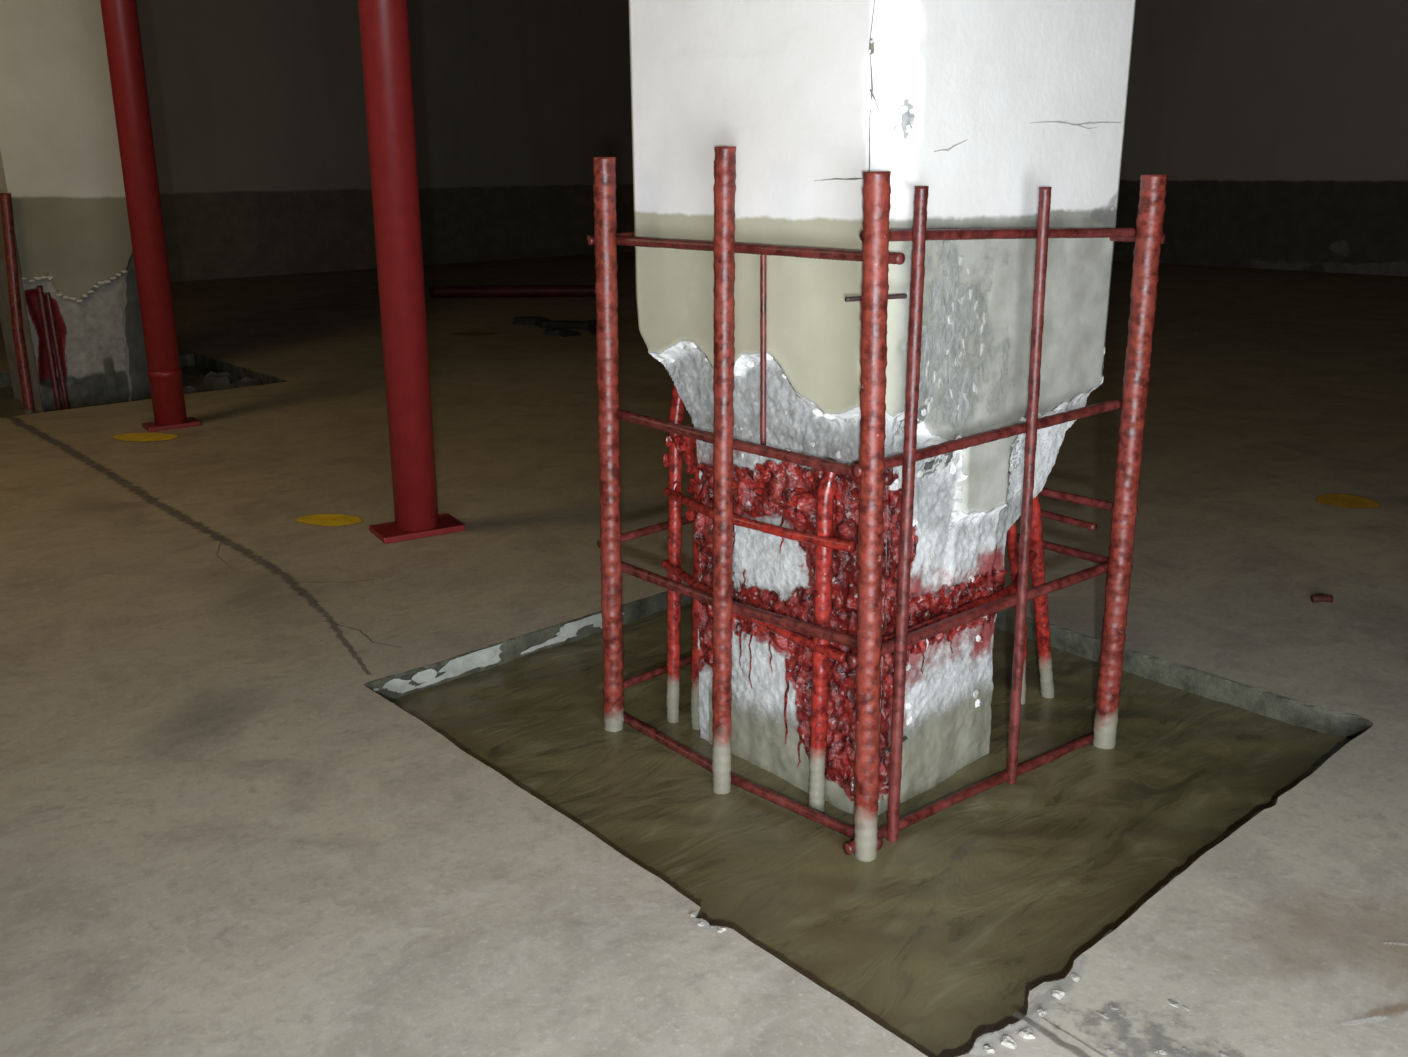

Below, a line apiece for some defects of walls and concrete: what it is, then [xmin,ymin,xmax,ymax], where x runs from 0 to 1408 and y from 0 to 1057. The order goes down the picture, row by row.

spalling [0,193,133,414]
crack [6,417,374,675]
spalling [651,341,714,742]
rust [663,424,714,672]
spalling [731,353,861,813]
rust [732,450,860,805]
rust [878,468,1007,803]
spalling [879,240,1100,736]